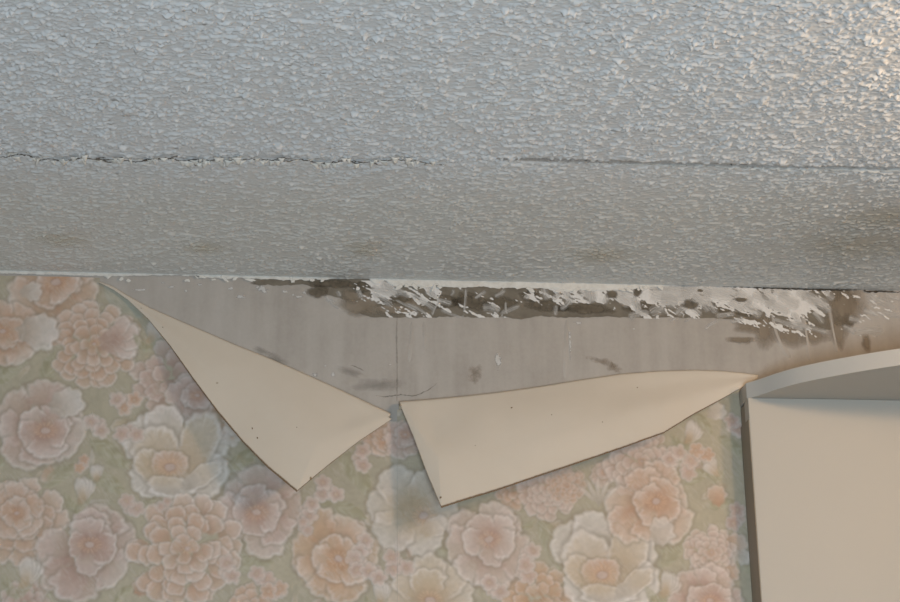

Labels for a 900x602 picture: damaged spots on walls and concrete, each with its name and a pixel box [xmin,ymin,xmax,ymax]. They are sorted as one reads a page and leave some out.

crack [2,152,442,169]
flaking render [0,270,899,337]